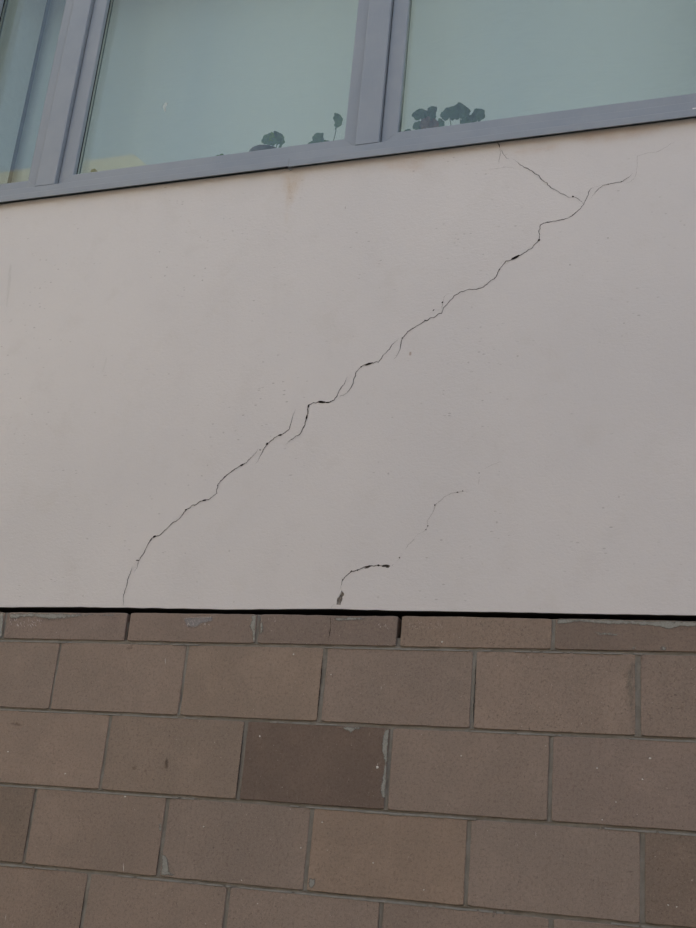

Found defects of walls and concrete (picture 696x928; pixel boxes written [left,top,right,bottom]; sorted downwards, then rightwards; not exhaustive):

crack [123,140,677,604]